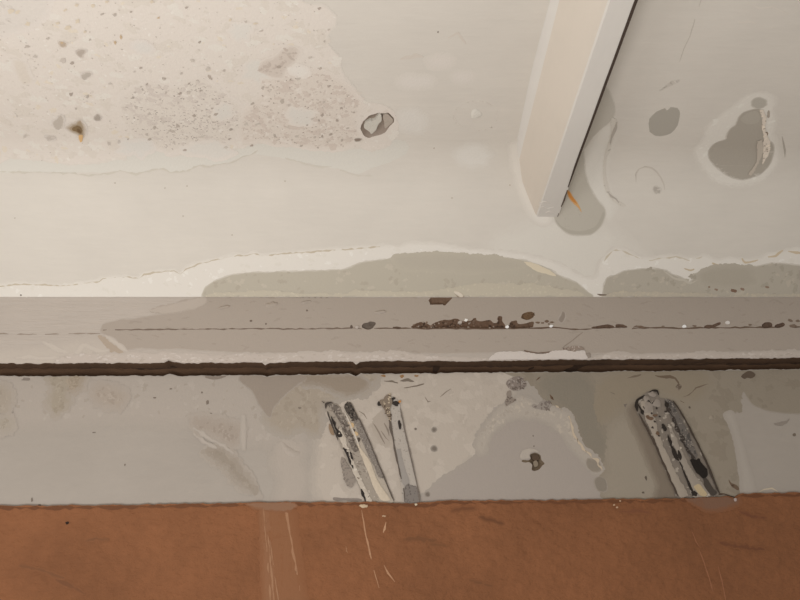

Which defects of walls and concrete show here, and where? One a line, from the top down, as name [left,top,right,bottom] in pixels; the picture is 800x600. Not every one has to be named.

peeling [0,0,400,166]
damp [0,85,800,363]